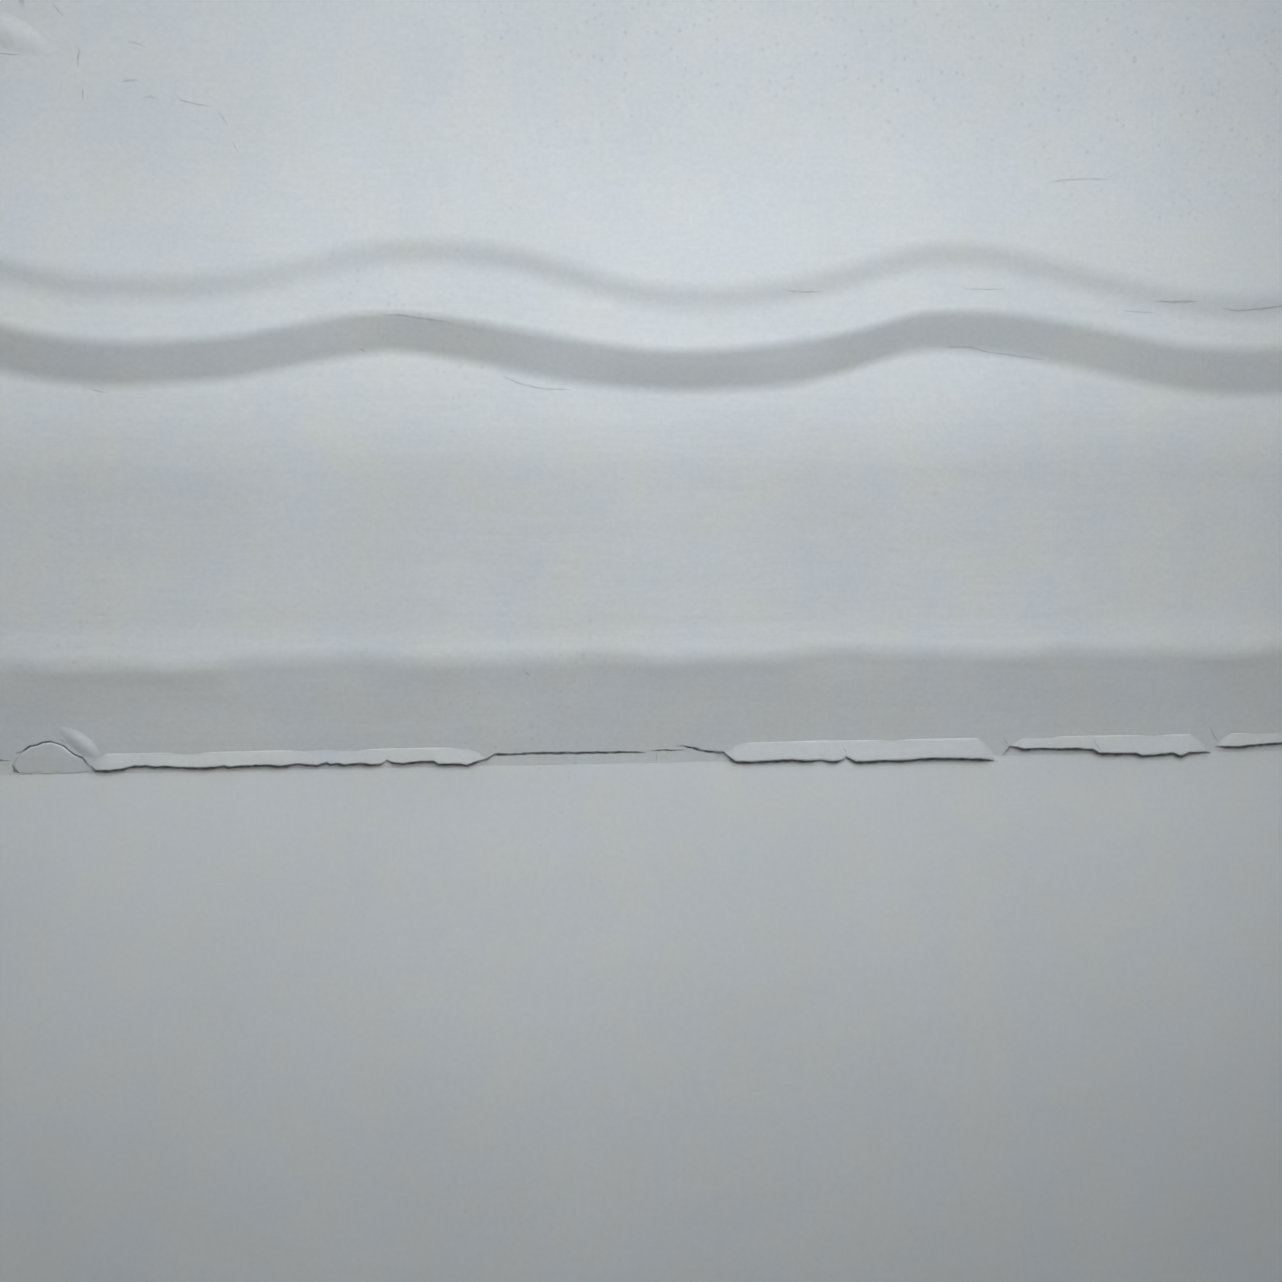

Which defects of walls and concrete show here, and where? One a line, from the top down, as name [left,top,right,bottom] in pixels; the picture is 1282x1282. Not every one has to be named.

crack [15,741,1282,773]